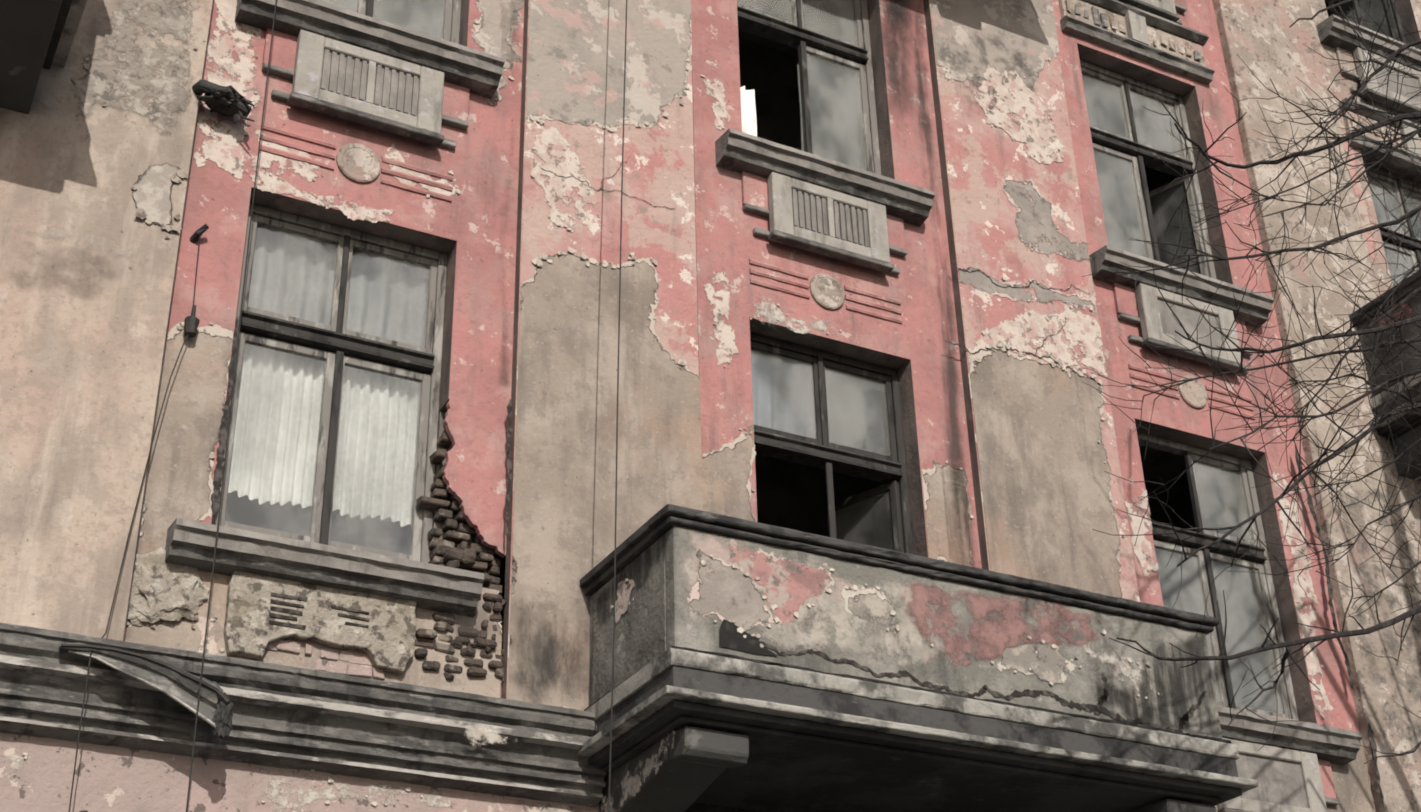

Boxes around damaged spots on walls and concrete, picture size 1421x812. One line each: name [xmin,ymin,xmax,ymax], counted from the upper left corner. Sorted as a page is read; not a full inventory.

flaking render [71,0,394,237]
peeling [930,0,1090,262]
flaking render [125,0,756,711]
peeling [750,297,842,334]
flaking render [921,267,1159,598]
peeling [261,769,467,812]
flaking render [679,530,1106,685]
crack [760,641,1207,734]
peeling [1218,472,1333,726]